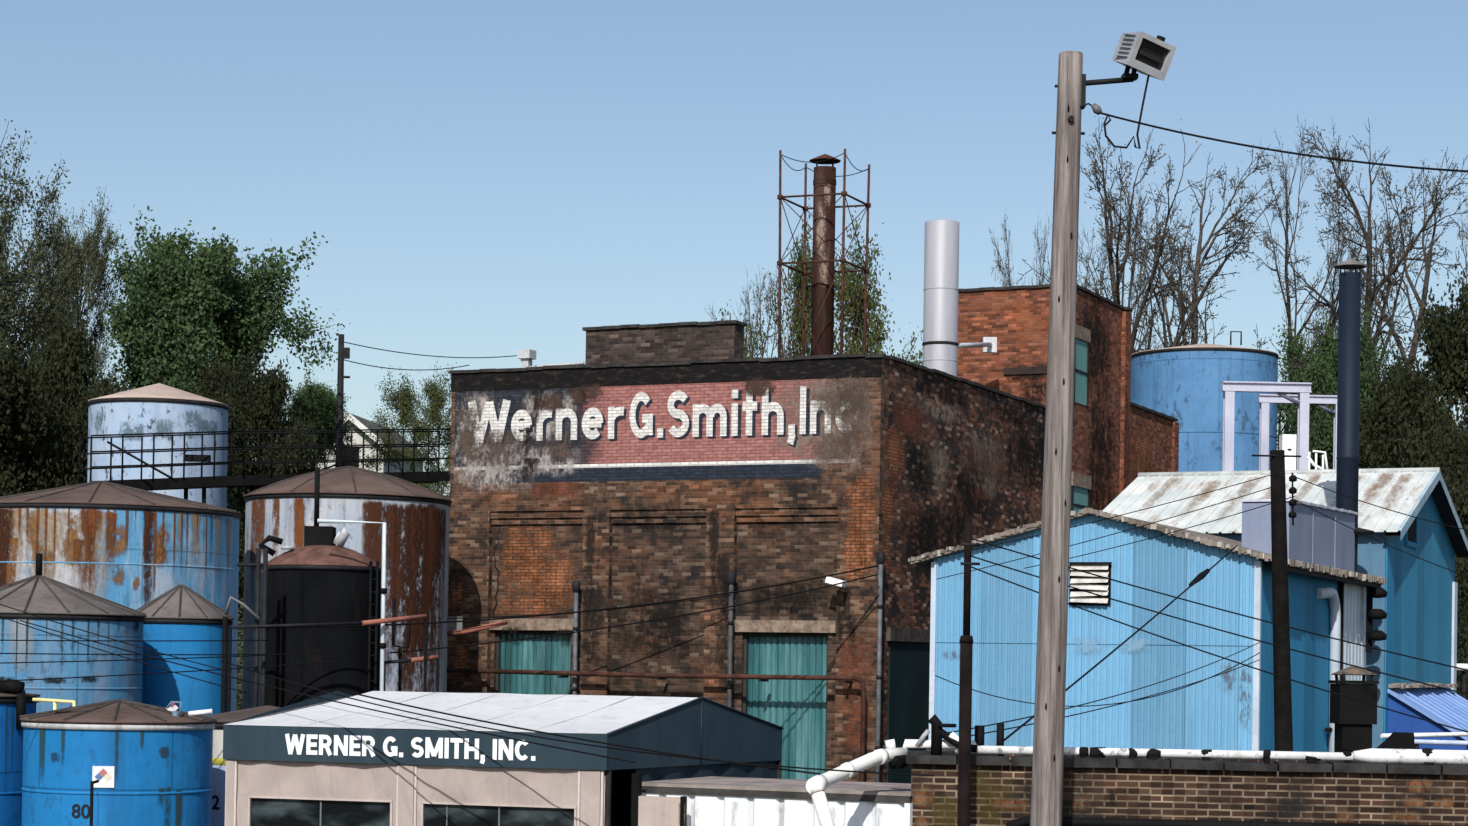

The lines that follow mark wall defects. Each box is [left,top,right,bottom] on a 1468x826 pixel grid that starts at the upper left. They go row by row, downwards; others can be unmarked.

spalling [95,410,217,440]
peeling [459,408,569,466]
peeling [534,384,602,411]
peeling [745,379,775,396]
rust [1359,473,1409,501]
rust [0,507,230,600]
rust [250,498,305,586]
rust [363,501,446,692]